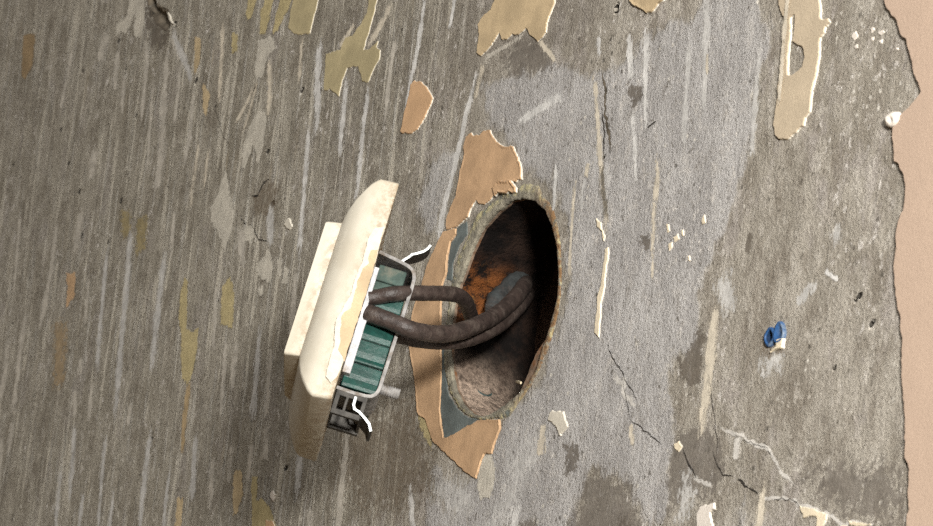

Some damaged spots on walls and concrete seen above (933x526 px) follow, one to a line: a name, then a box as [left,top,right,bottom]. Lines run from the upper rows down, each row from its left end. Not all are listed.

peeling [324,0,381,97]
peeling [400,80,434,134]
peeling [476,0,556,56]
peeling [773,0,831,140]
peeling [409,130,562,479]
crack [608,347,874,526]